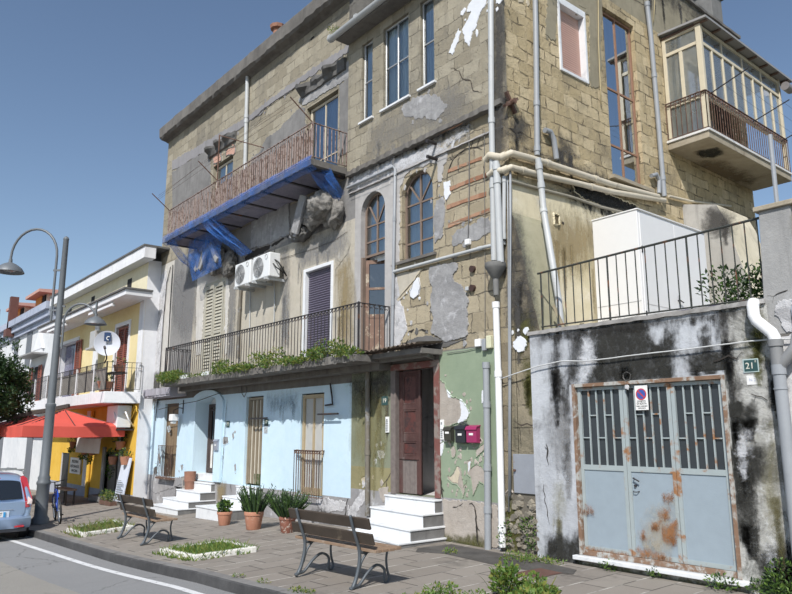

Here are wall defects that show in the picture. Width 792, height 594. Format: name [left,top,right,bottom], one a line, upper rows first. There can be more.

peeling [449,7,466,55]
peeling [401,89,462,135]
peeling [390,147,491,350]
spalling [440,374,472,427]
damp [542,309,764,560]
damp [753,332,777,418]
peeling [440,438,539,556]
corrosion [652,494,678,545]